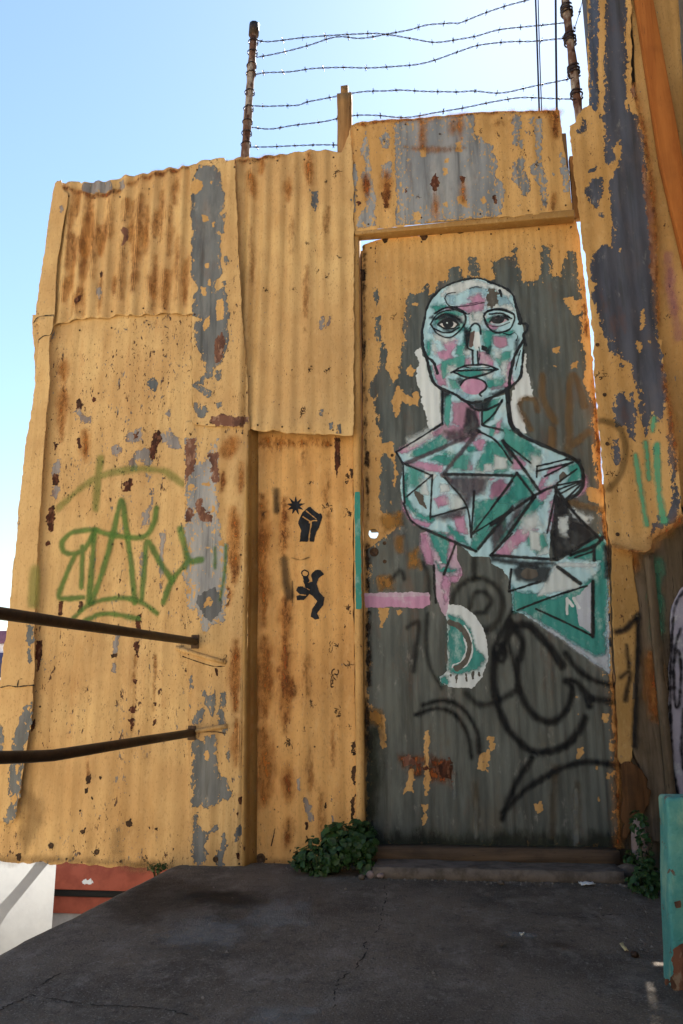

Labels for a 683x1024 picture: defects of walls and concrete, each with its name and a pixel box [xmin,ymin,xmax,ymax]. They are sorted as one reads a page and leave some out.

peeling [111,165,249,634]
peeling [319,409,341,434]
peeling [349,0,681,843]
corrosion [257,599,308,700]
peeling [0,701,33,824]
peeling [188,675,242,866]
corrosion [399,754,454,782]